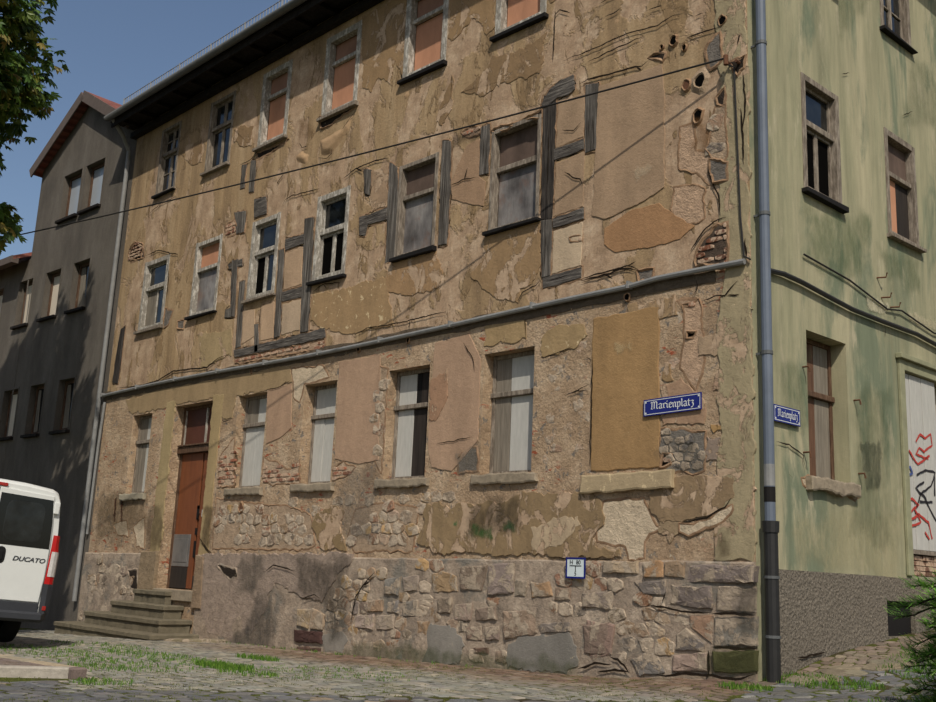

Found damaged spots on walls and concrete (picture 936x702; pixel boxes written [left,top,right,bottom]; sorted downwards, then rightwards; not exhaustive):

flaking render [448,0,496,41]
flaking render [436,32,547,126]
crack [552,6,740,83]
spalling [647,51,667,63]
spalling [704,30,747,77]
spalling [670,86,730,268]
flaking render [470,221,541,303]
flaking render [198,294,735,640]
crack [681,498,731,523]
crack [350,573,374,623]